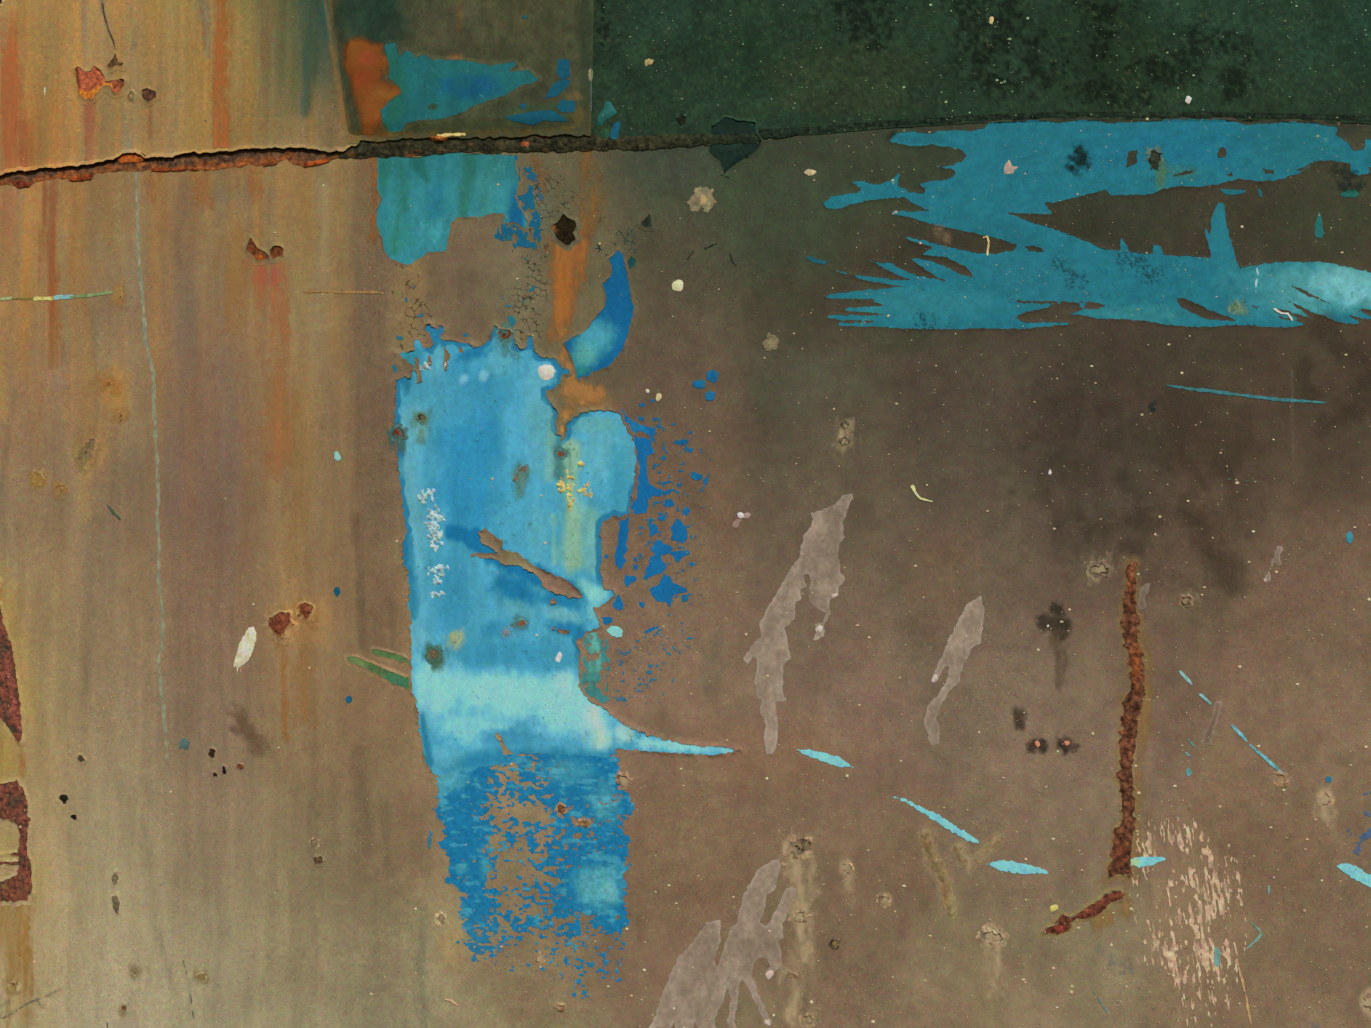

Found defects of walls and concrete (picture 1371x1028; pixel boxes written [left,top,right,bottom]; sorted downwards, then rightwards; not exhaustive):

spalling [1144,145,1164,171]
peeling [1220,189,1262,197]
peeling [1315,212,1324,238]
rust [548,191,606,478]
peeling [371,40,747,1000]
rust [0,576,27,746]
rust [268,603,313,638]
rust [1038,553,1150,940]
rust [0,776,37,907]